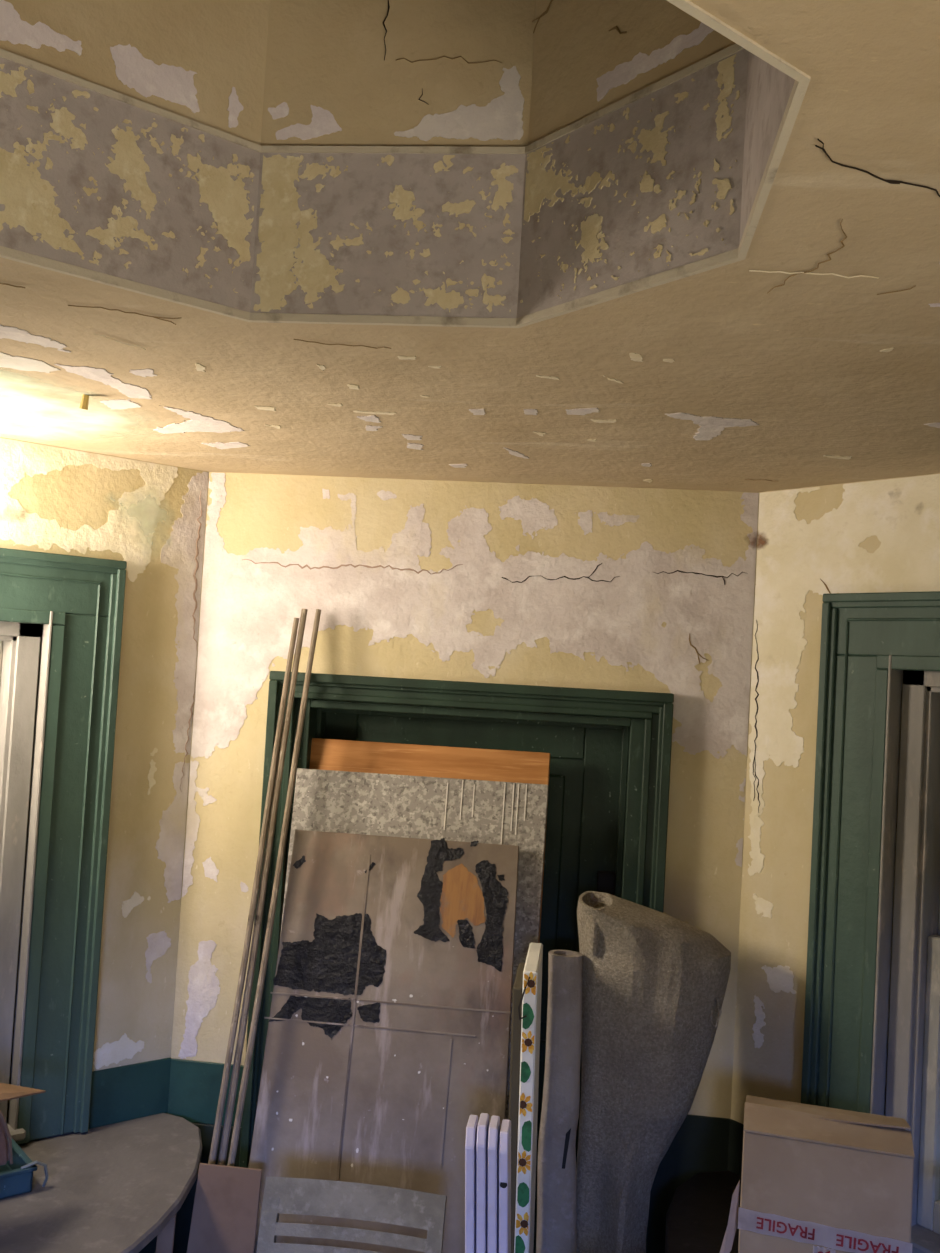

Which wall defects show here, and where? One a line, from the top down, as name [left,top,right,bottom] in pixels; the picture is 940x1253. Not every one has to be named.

flaking render [0,0,82,56]
flaking render [110,44,200,113]
peeling [0,64,737,312]
crack [815,139,940,197]
damp [0,371,135,439]
peeling [0,325,249,449]
crack [502,563,620,583]
crack [654,570,748,585]
crack [180,491,202,790]
flaking render [0,438,940,903]
crack [752,620,760,813]
flaking render [178,940,220,1059]